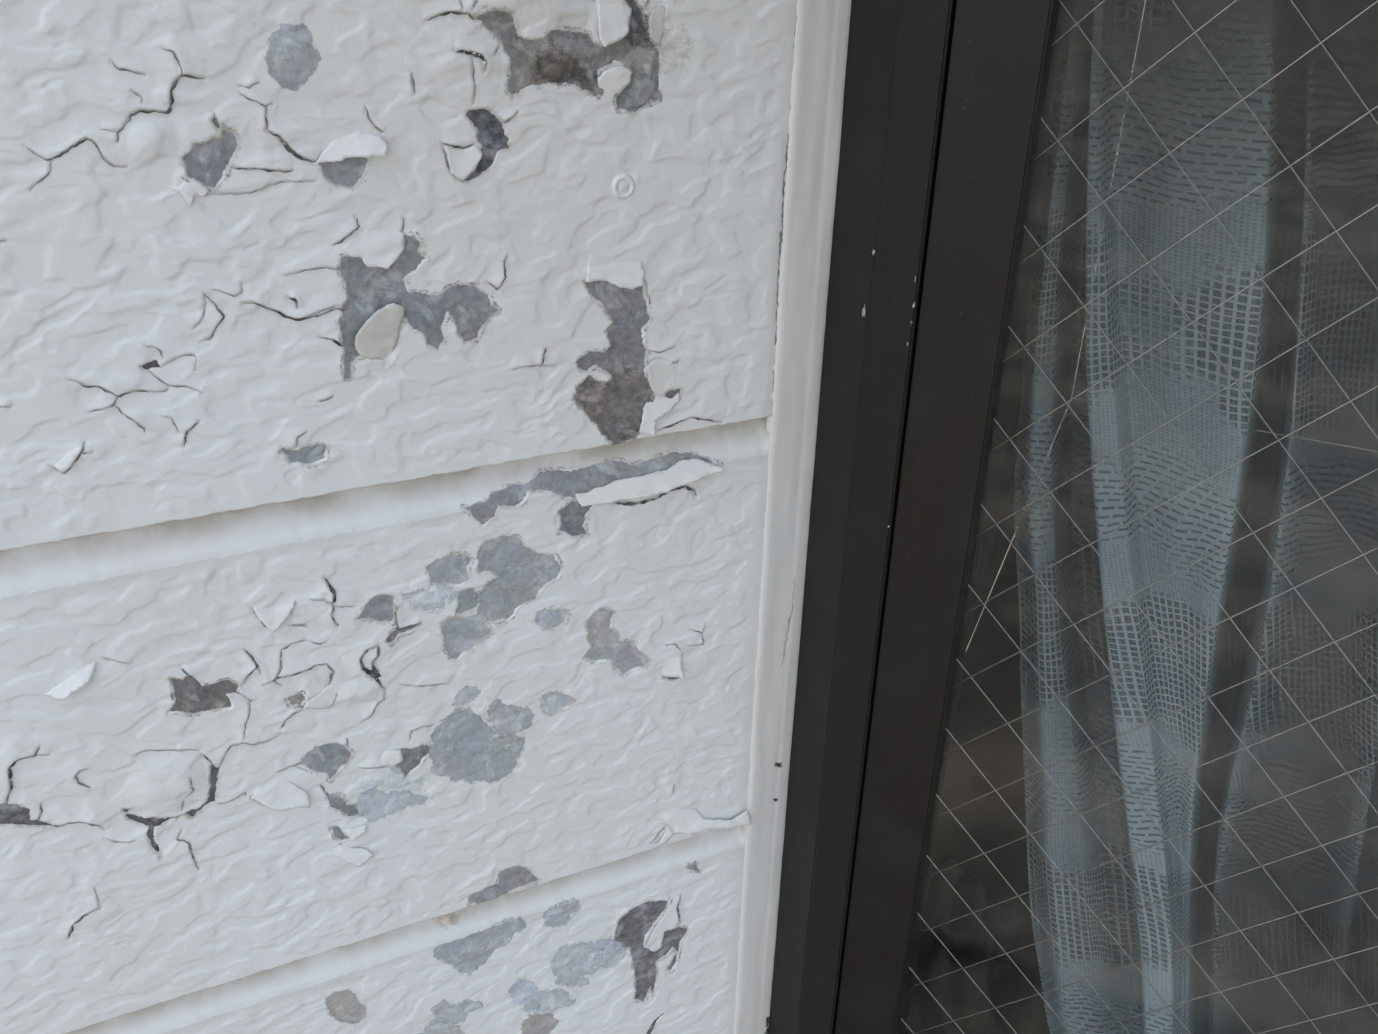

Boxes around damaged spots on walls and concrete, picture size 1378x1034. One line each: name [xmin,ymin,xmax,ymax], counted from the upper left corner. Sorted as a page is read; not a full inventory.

crack [26,49,203,192]
peeling [169,113,237,207]
crack [207,167,314,195]
peeling [441,109,518,181]
peeling [427,0,665,112]
peeling [287,217,501,378]
crack [53,286,347,474]
peeling [279,260,725,867]
crack [244,579,343,687]
peeling [0,658,337,851]
crack [177,831,199,869]
peeling [509,897,687,1034]